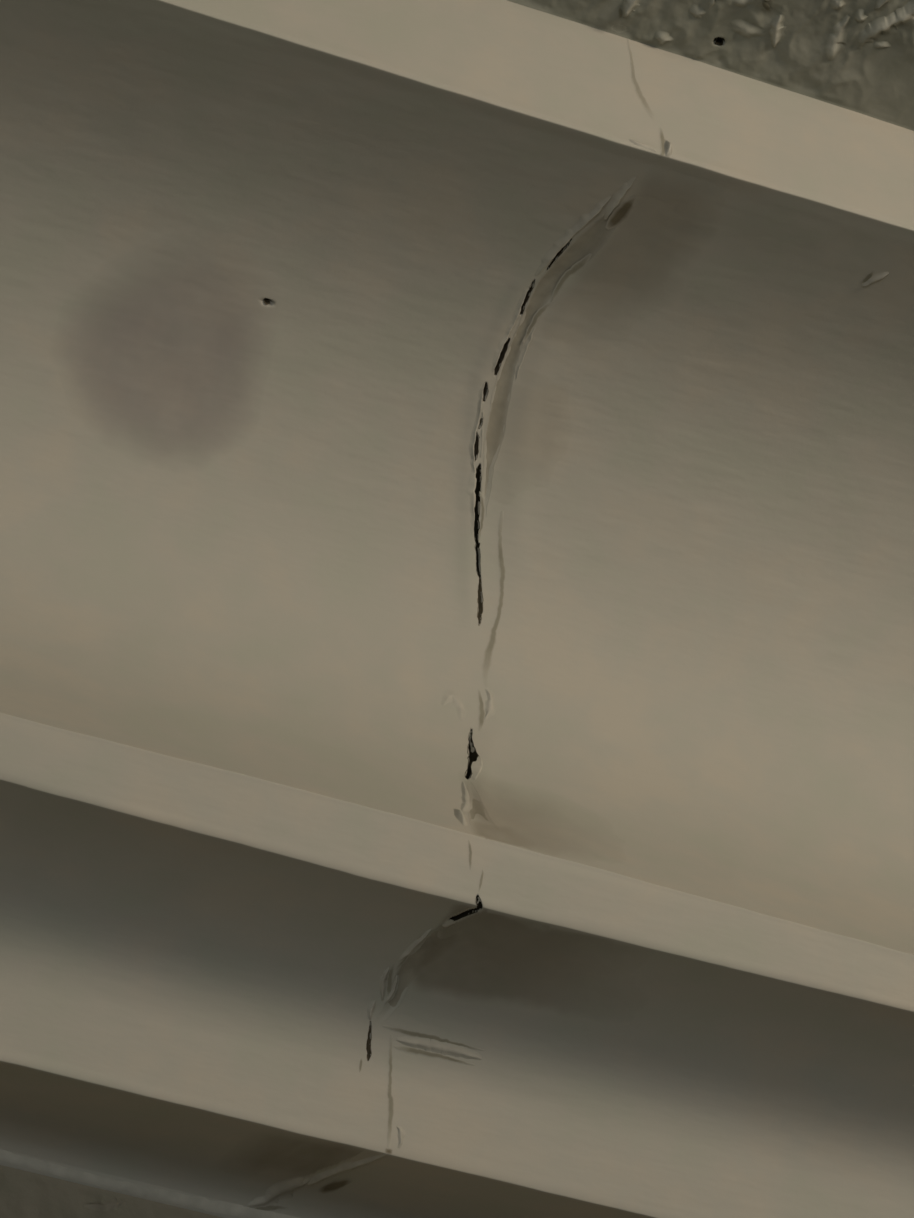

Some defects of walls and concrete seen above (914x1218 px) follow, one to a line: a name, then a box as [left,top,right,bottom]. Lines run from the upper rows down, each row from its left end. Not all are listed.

peeling [715,0,786,48]
peeling [824,0,914,61]
crack [245,39,673,1211]